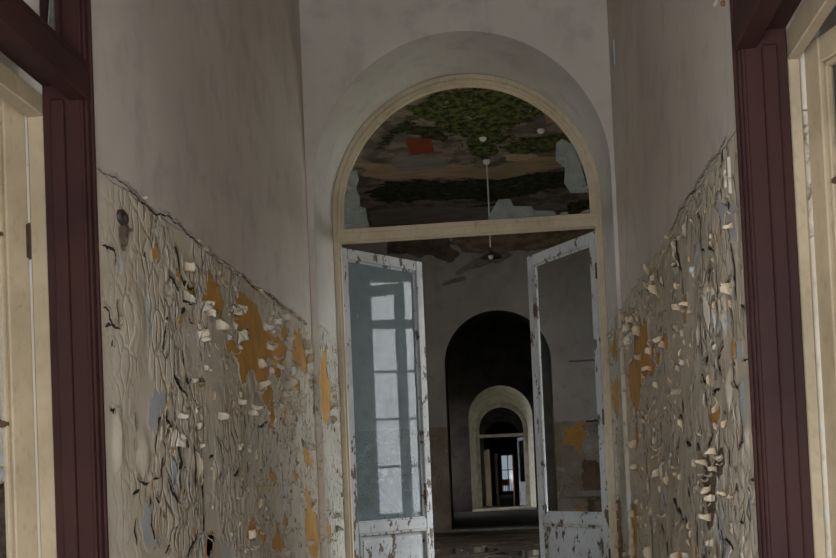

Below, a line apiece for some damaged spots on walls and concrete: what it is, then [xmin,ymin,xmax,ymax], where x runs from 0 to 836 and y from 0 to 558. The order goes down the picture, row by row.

peeling [98,164,344,558]
peeling [560,420,602,512]
peeling [603,130,740,558]